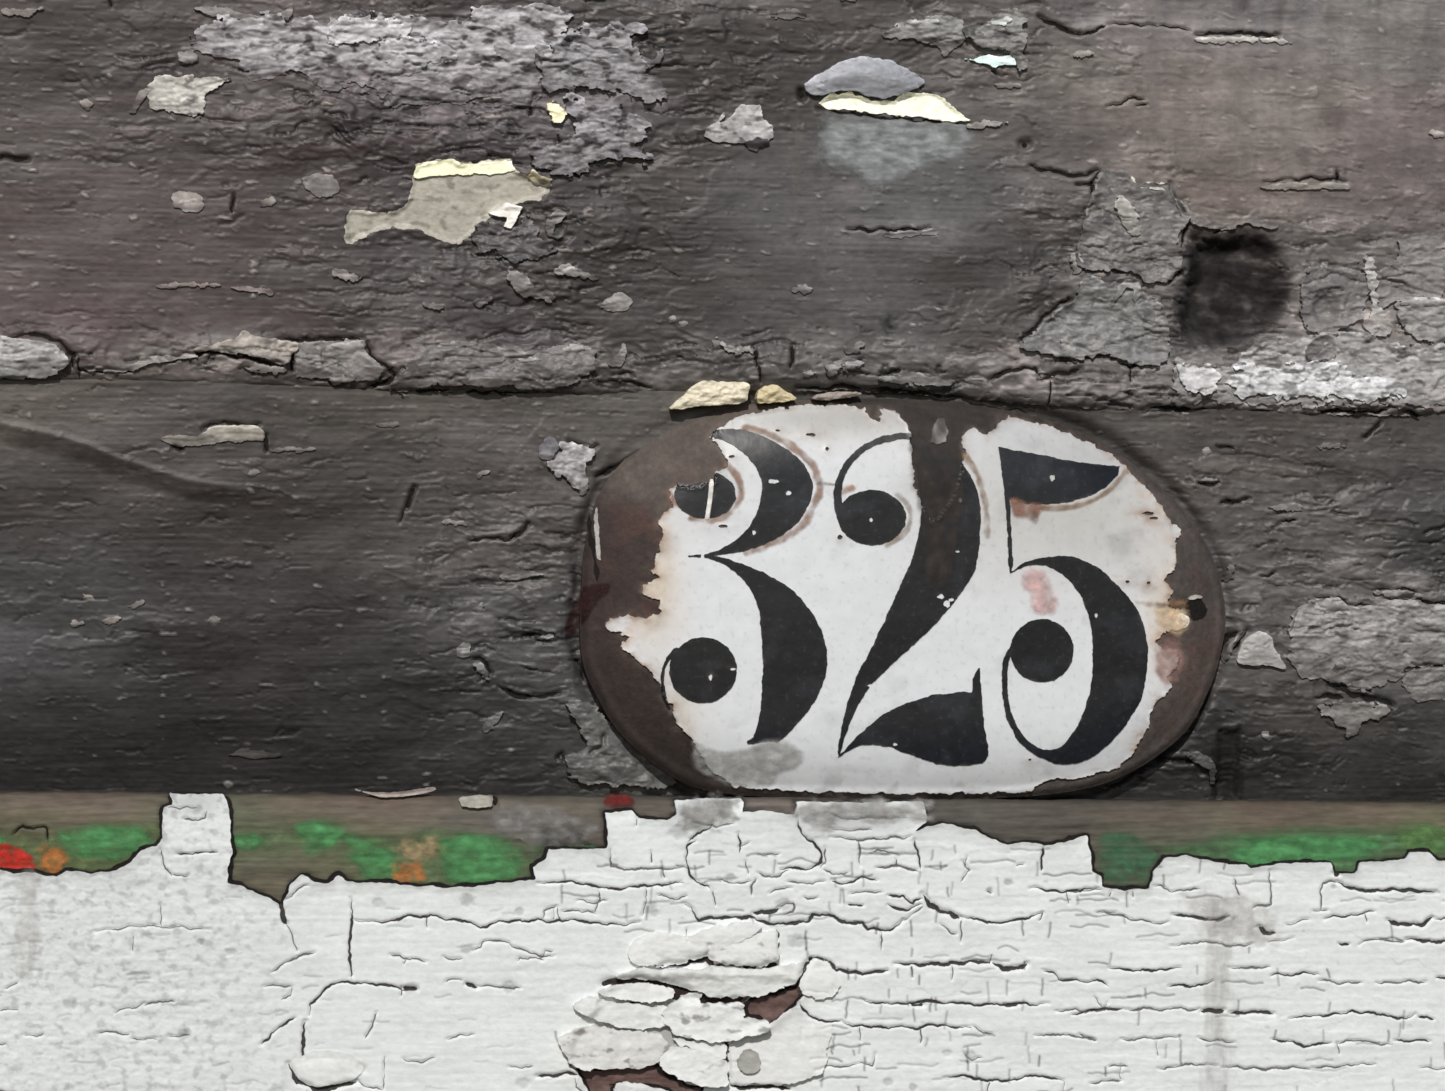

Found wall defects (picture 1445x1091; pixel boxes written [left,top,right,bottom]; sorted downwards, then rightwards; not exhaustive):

crack [1038,17,1279,38]
peeling [130,3,668,303]
peeling [0,330,627,394]
peeling [1019,170,1445,410]
rust [689,468,743,522]
rust [742,425,854,551]
rust [898,406,993,581]
rust [1010,478,1120,519]
peeling [1221,589,1445,738]
crack [99,806,215,951]
crack [100,1000,190,1040]
crack [262,814,1445,1091]